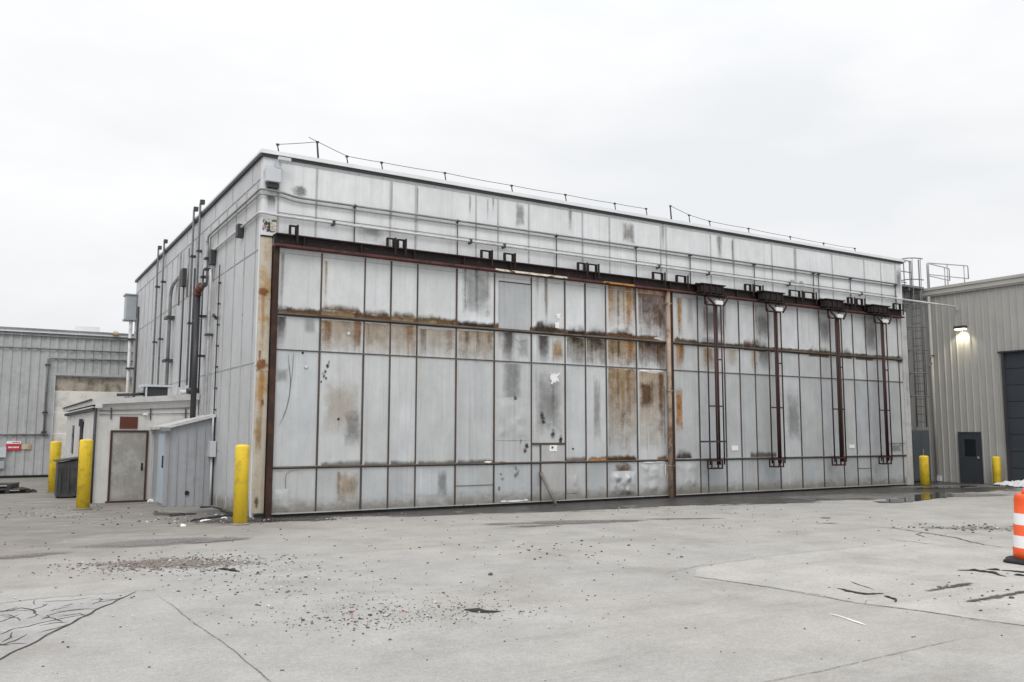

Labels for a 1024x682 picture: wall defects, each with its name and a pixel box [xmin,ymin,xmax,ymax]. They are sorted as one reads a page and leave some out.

corrosion [256,350,267,405]
corrosion [285,307,537,344]
corrosion [558,286,745,425]
corrosion [761,347,897,358]
crack [0,590,271,682]